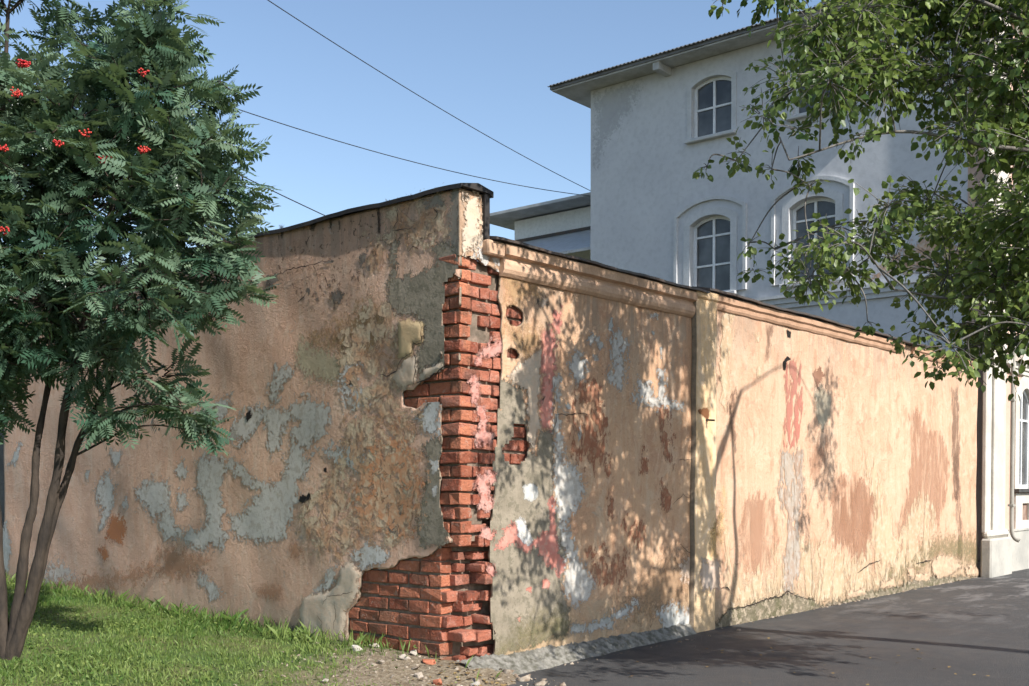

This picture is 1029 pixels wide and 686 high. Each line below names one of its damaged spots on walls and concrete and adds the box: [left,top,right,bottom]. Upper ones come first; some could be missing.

spalling [85,182,685,661]
water stain [738,492,779,575]
water stain [812,366,832,432]
peeling [676,354,980,628]
water stain [828,472,880,562]
water stain [885,392,980,581]